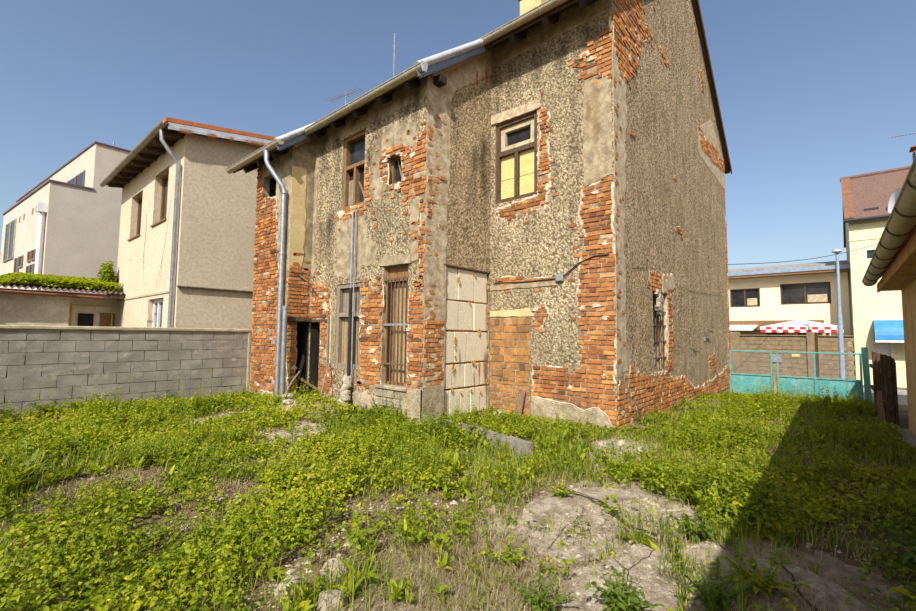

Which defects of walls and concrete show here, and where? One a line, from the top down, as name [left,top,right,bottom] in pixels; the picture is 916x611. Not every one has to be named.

flaking render [495,108,558,224]
flaking render [567,0,670,90]
flaking render [694,15,725,176]
flaking render [250,168,336,396]
flaking render [334,107,447,395]
flaking render [494,275,556,293]
flaking render [531,102,731,428]